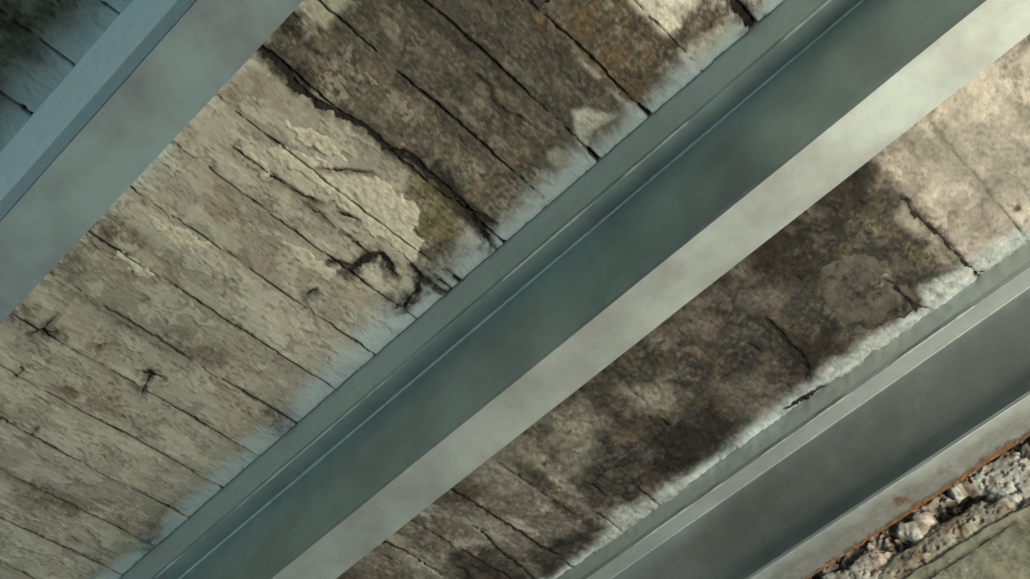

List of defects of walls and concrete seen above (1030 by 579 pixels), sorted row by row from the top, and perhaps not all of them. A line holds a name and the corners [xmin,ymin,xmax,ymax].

crack [258,46,495,247]
crack [235,148,459,310]
crack [901,195,1011,276]
crack [141,370,164,394]
water stain [339,159,1030,579]
corrosion [806,431,1030,579]